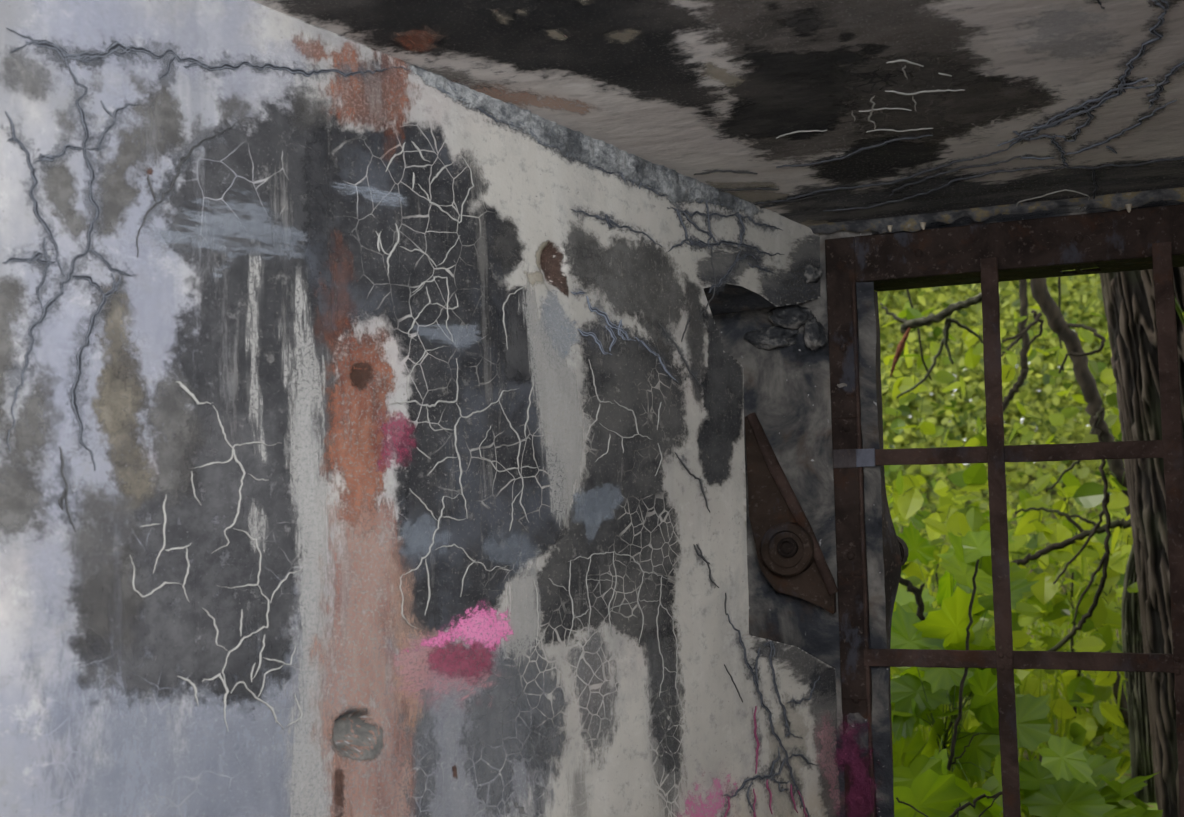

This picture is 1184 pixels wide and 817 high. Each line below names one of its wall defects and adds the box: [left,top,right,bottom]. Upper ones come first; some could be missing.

damp [266,0,1062,186]
damp [0,278,55,538]
crack [130,381,304,732]
rust [334,771,344,817]
rust [321,318,397,536]
damp [42,76,689,817]
crack [375,141,540,629]
rust [540,241,569,297]
crack [2,0,1184,532]
crack [533,551,683,711]
crack [693,544,820,817]